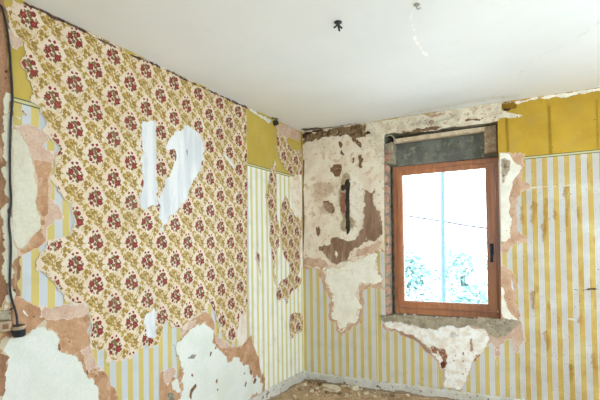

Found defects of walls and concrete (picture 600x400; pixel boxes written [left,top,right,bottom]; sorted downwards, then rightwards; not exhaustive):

peeling [0,0,118,400]
peeling [276,102,522,336]
peeling [499,152,531,254]
peeling [159,311,265,400]
flaking render [382,265,526,391]